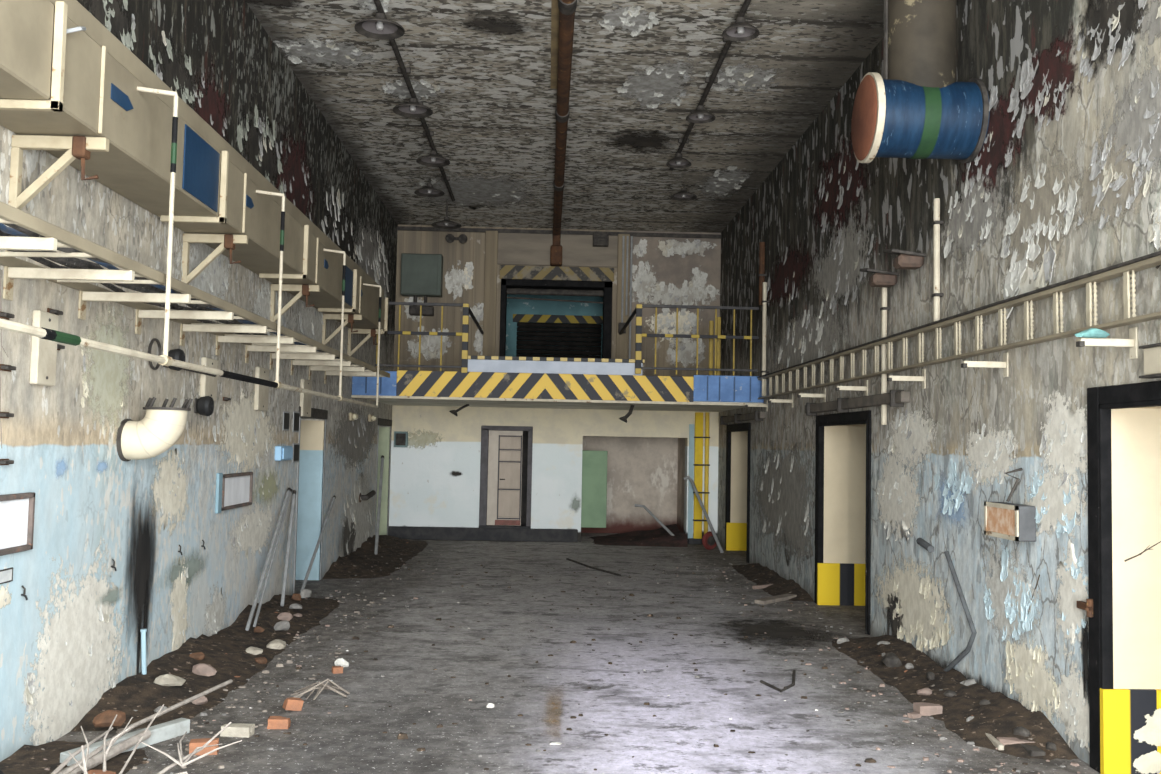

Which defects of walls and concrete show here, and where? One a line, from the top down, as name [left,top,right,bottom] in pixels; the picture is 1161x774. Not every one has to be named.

leakage [245,0,297,8]
leakage [465,16,525,35]
leakage [610,130,672,151]
peeling [445,258,474,300]
peeling [469,303,484,355]
peeling [629,239,720,368]
peeling [873,405,1019,652]
peeling [982,391,1090,753]
peeling [22,538,127,746]